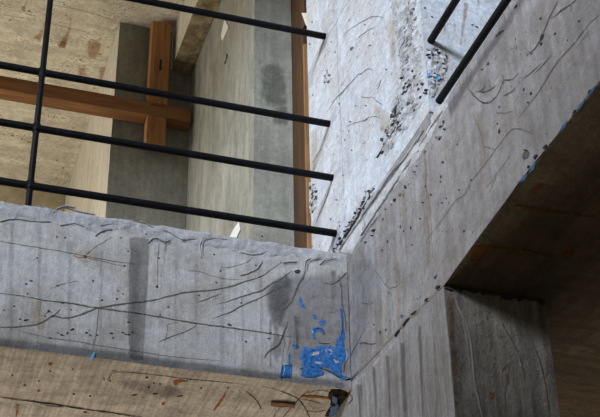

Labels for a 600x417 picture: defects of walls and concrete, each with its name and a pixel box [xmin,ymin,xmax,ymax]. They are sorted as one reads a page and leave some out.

crack [325,3,383,39]
crack [325,69,382,126]
spalling [376,0,449,158]
crack [424,0,597,255]
crack [3,239,133,266]
crack [2,260,305,361]
peeling [280,354,292,378]
damp [272,276,352,373]
peeling [293,308,353,417]